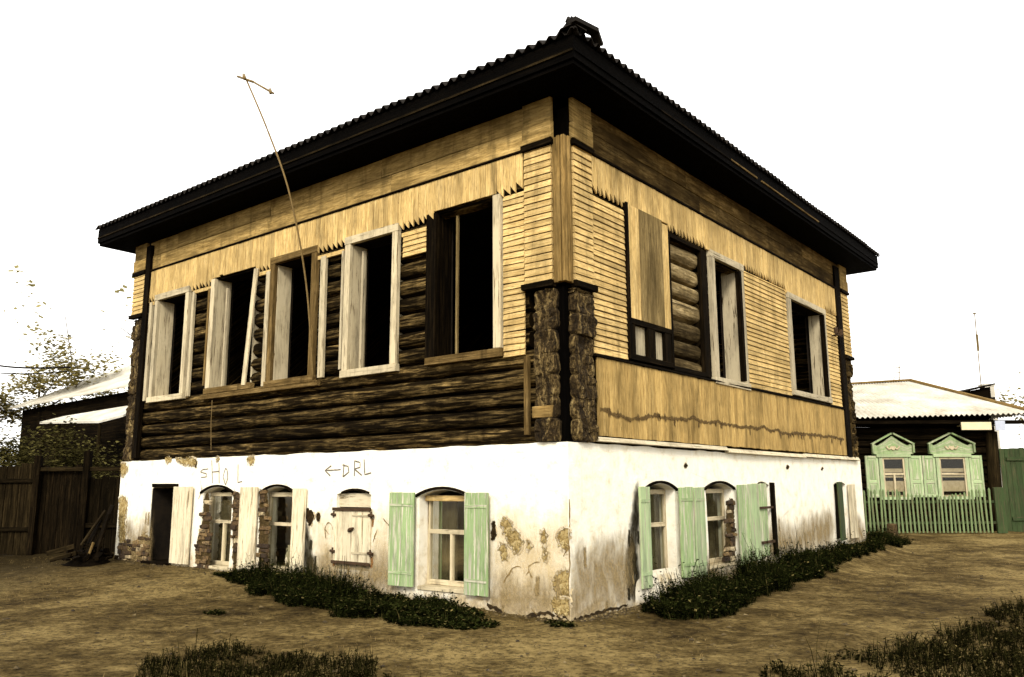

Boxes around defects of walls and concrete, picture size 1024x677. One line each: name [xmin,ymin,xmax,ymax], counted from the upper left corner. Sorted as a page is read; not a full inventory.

peeling [165,455,197,468]
flaking render [117,494,151,562]
flaking render [194,491,213,569]
flaking render [230,491,240,569]
flaking render [256,489,271,568]
peeling [490,516,573,619]
damp [575,488,639,613]
flaking render [722,498,738,562]